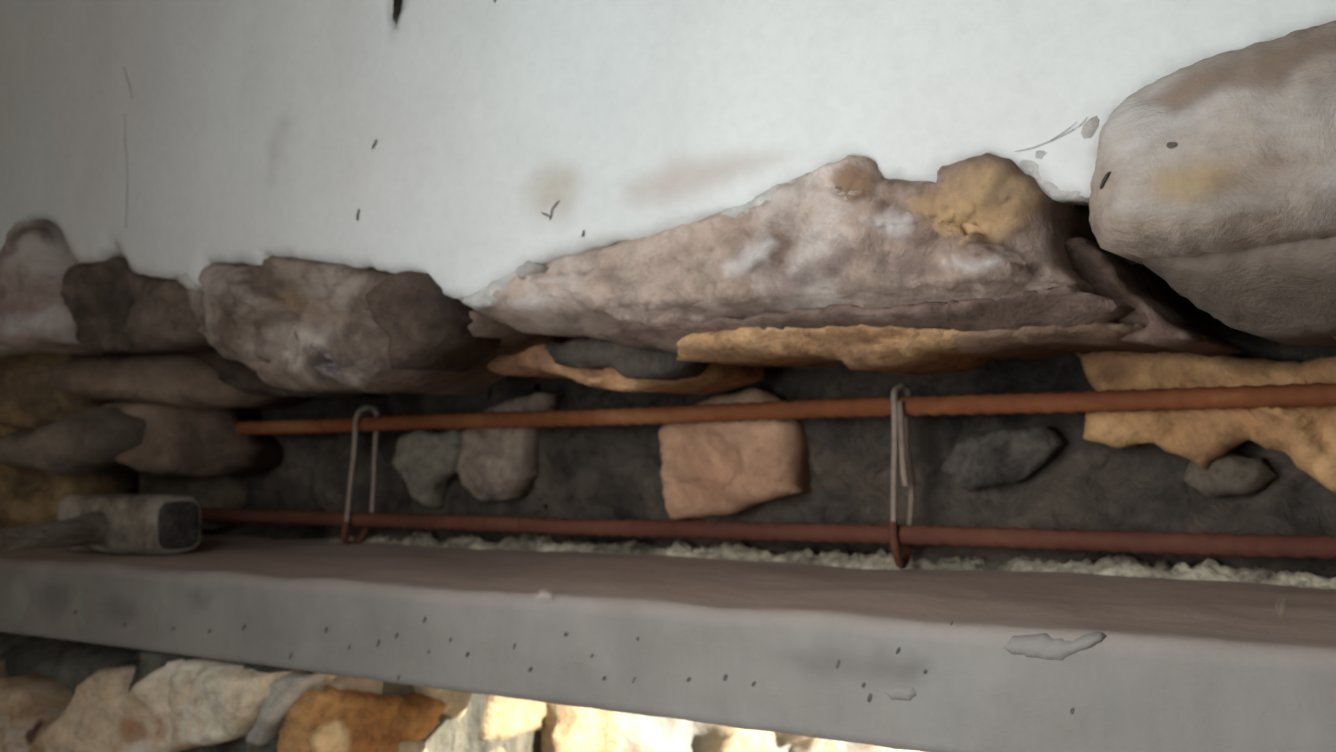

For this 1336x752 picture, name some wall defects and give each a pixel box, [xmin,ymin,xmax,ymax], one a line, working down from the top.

hole [392,0,403,25]
flaking render [1081,115,1100,139]
flaking render [716,172,811,218]
flaking render [1020,150,1089,206]
flaking render [458,260,549,310]
spalling [235,382,1336,435]
spalling [200,508,1336,560]